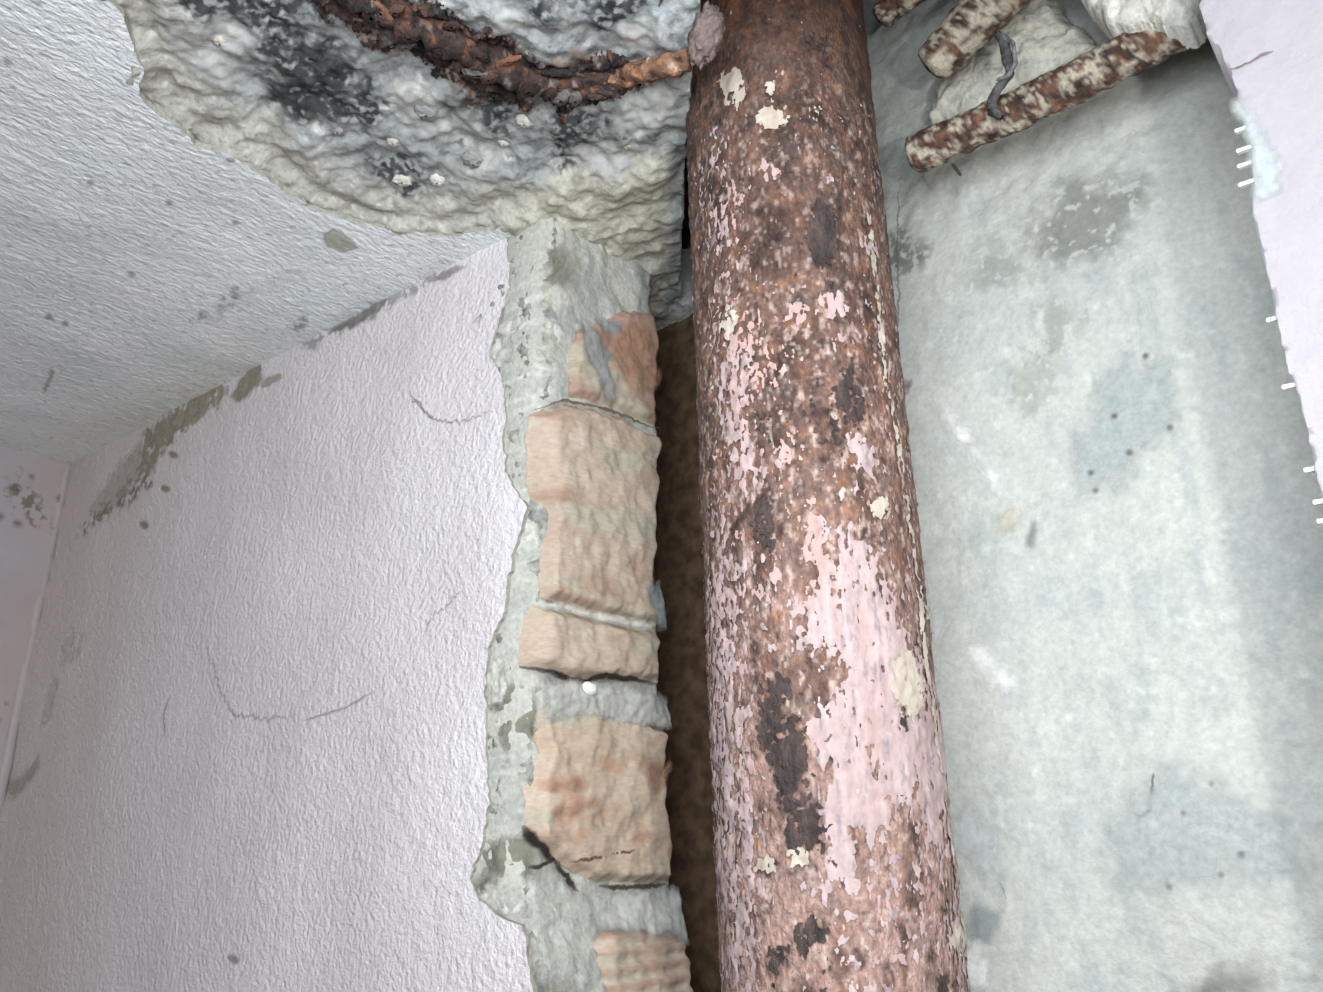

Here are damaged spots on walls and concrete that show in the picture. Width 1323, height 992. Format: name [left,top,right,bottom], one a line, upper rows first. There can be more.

rust [312,0,726,126]
rust [872,0,926,27]
rust [918,0,1030,80]
rust [905,30,1190,173]
spalling [100,0,970,992]